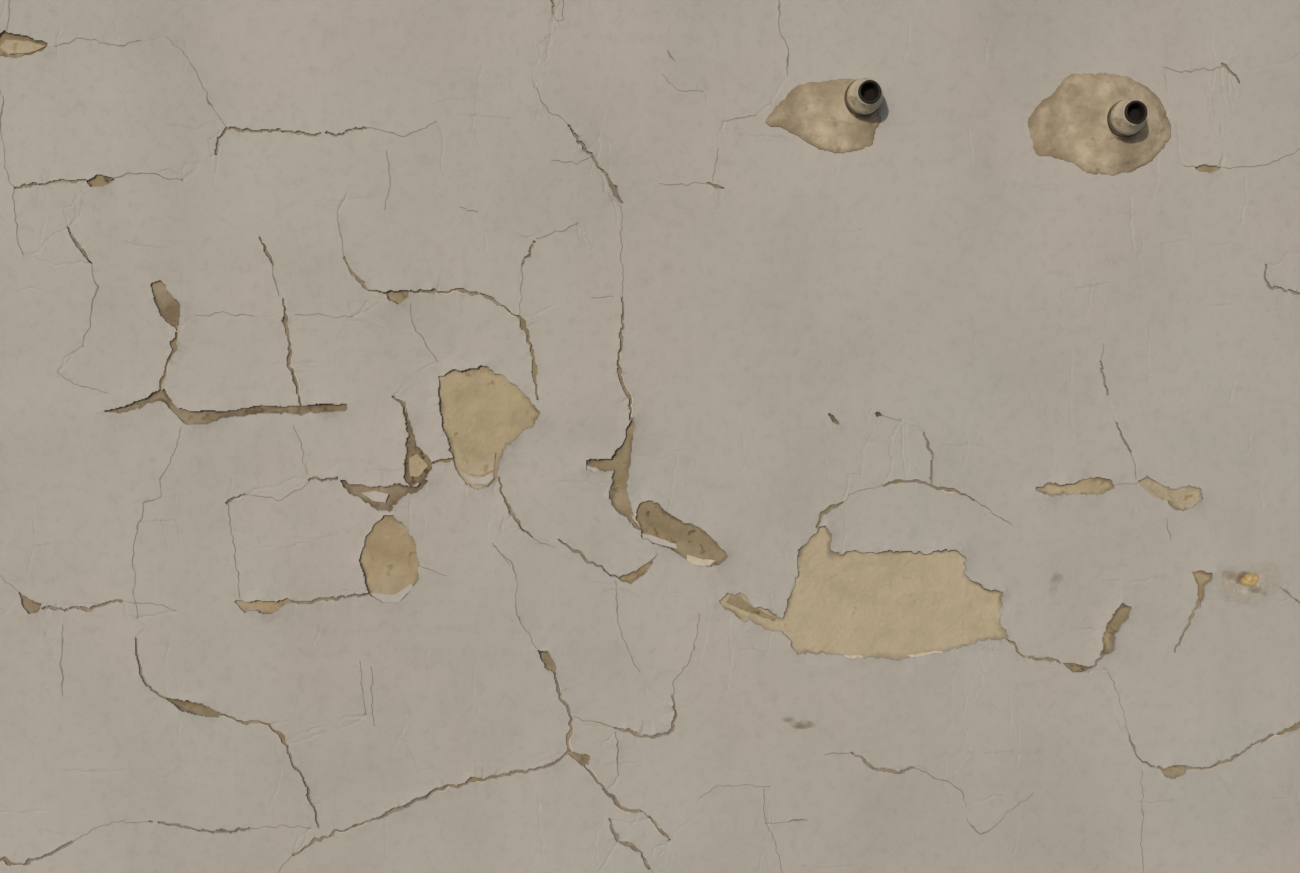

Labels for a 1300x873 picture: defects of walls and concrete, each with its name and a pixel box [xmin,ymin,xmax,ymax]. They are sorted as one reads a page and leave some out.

peeling [0,0,140,58]
crack [0,91,182,255]
crack [165,36,436,210]
crack [536,88,633,419]
crack [0,213,700,873]
peeling [309,365,556,602]
peeling [586,419,727,566]
peeling [719,525,1008,660]
crack [816,432,1012,529]
peeling [1100,603,1130,655]
peeling [1036,476,1202,539]
crack [1006,638,1300,873]